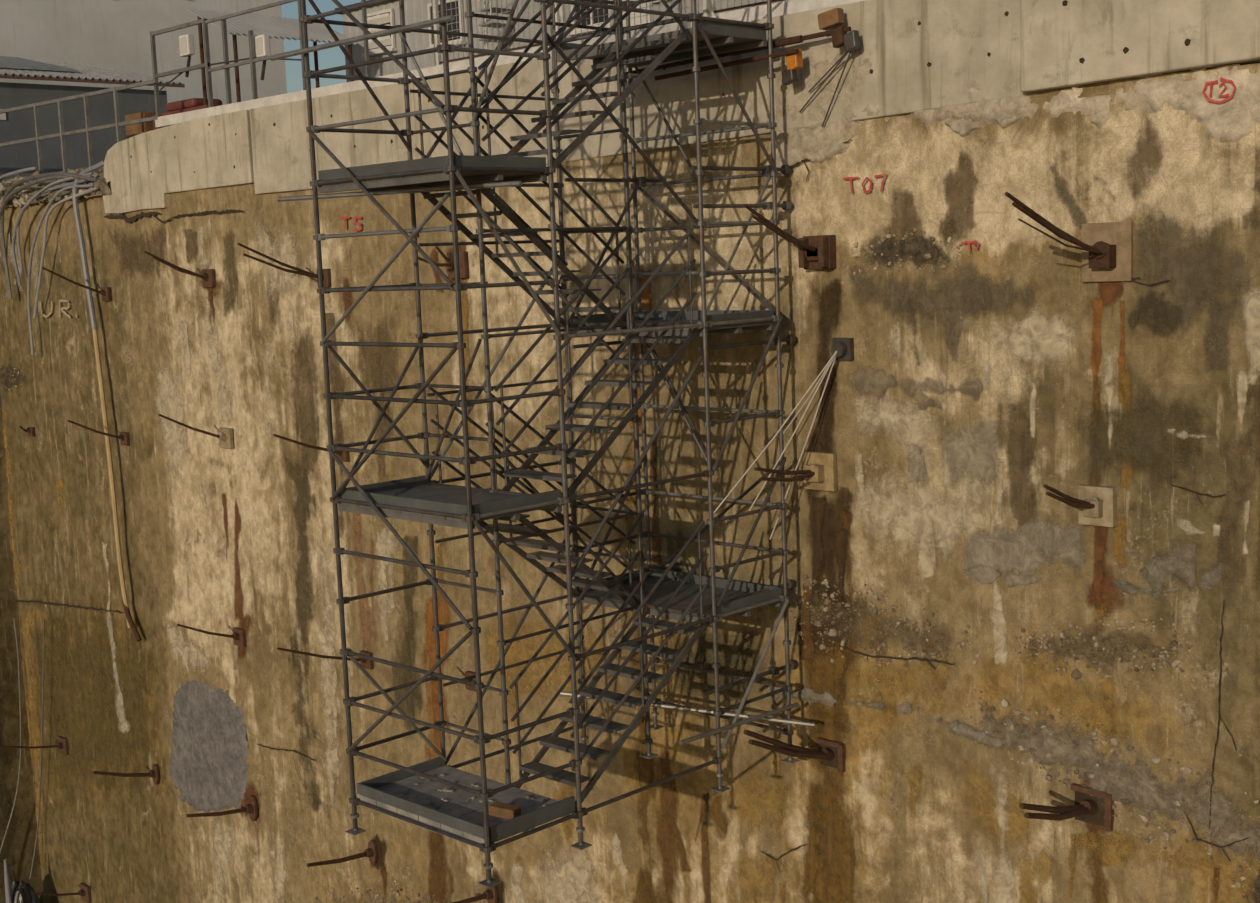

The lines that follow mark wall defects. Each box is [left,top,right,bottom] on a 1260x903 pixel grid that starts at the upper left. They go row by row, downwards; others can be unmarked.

corrosion [806,280,841,453]
spalling [851,228,962,280]
water stain [854,383,1037,578]
water stain [940,155,974,245]
water stain [851,192,1074,388]
flaking render [766,53,1260,180]
corrosion [1091,281,1132,419]
water stain [1129,216,1260,582]
corrosion [222,494,250,657]
corrosion [797,488,856,903]
spalling [788,575,983,670]
crack [1184,600,1249,862]